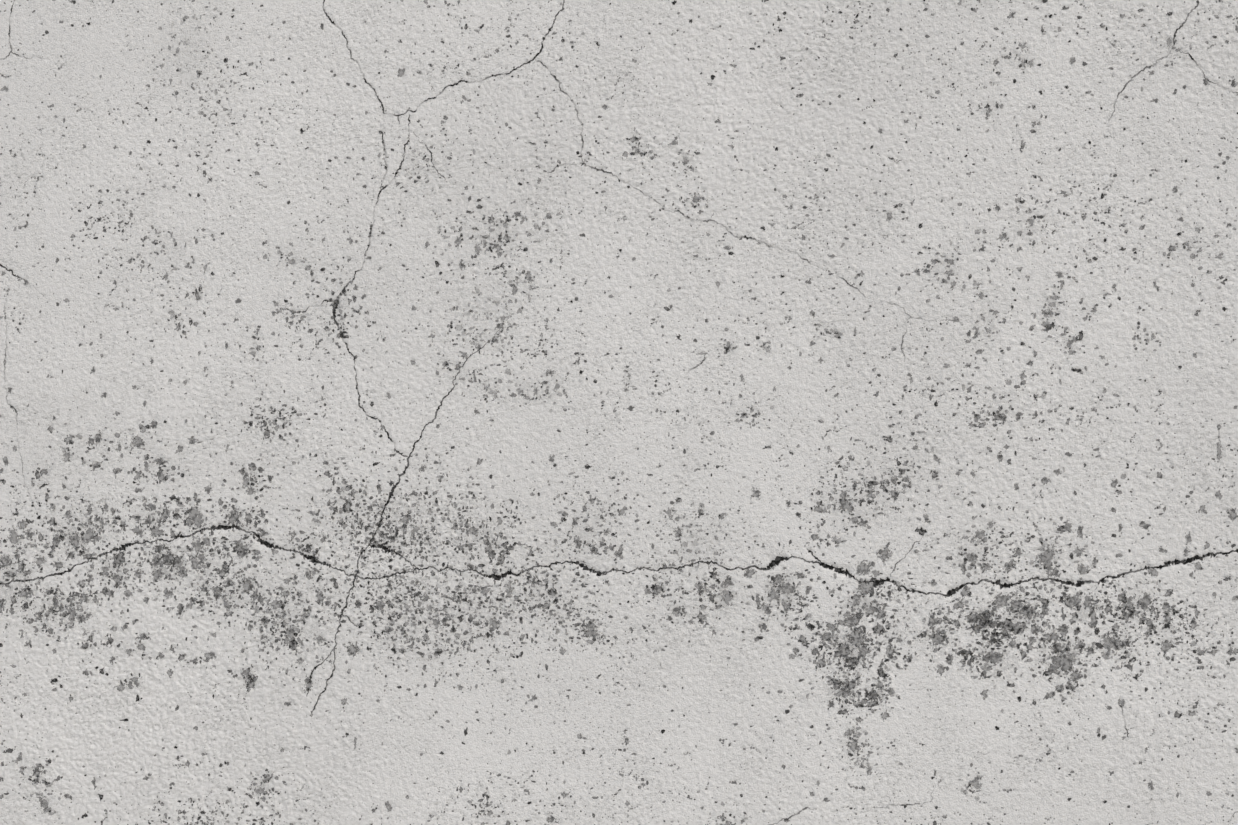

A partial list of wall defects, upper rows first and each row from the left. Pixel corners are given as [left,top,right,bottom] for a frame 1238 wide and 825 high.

crack [323,0,613,204]
crack [1117,0,1238,97]
crack [676,210,769,247]
crack [0,225,1238,718]